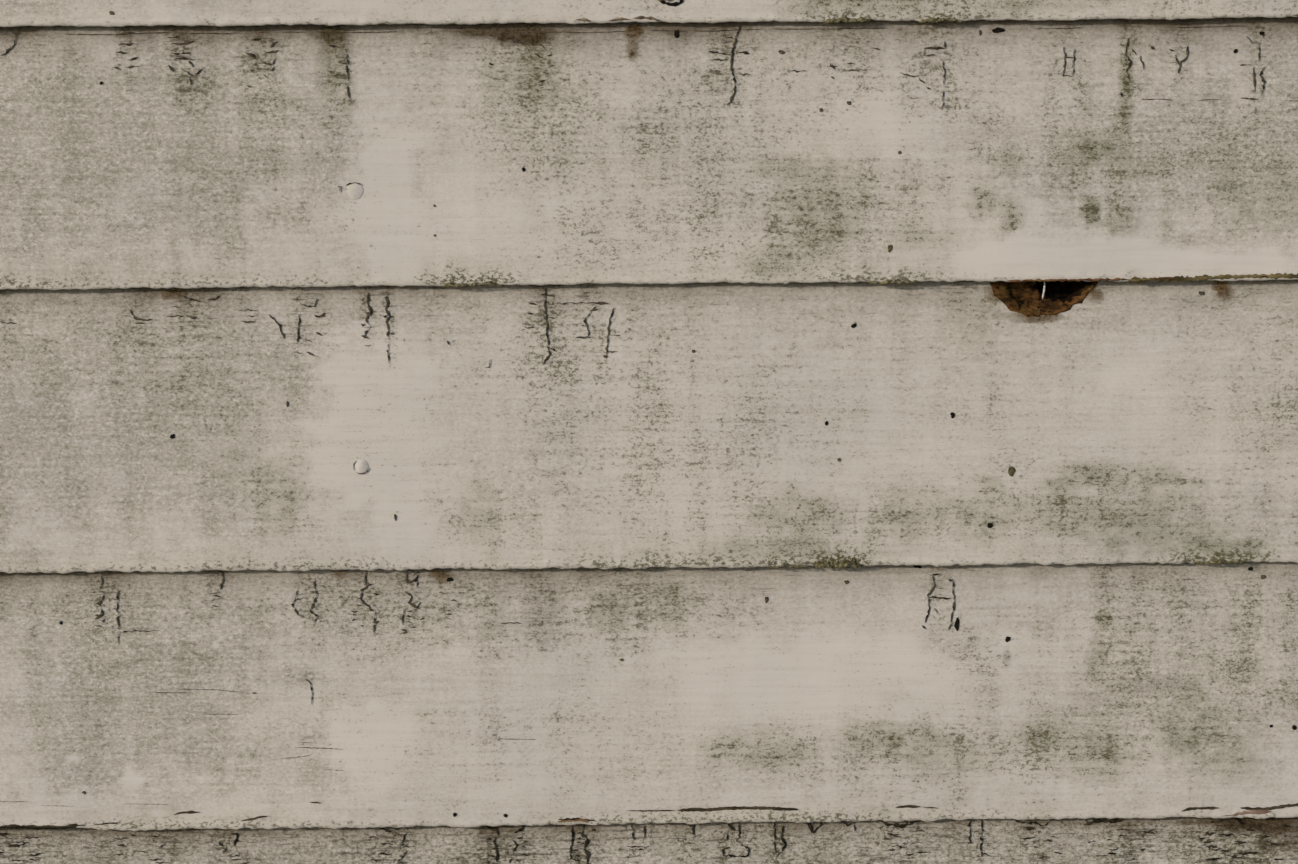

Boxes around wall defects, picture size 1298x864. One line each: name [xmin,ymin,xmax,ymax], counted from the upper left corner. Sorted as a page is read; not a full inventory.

crack [76,31,396,105]
damp [1119,54,1133,130]
crack [1120,26,1298,101]
damp [1063,141,1110,166]
mould [764,168,863,246]
damp [1079,197,1100,223]
crack [525,288,619,365]
damp [764,485,842,556]
damp [1015,464,1173,540]
crack [87,574,159,645]
crack [351,570,455,635]
crack [922,573,955,630]